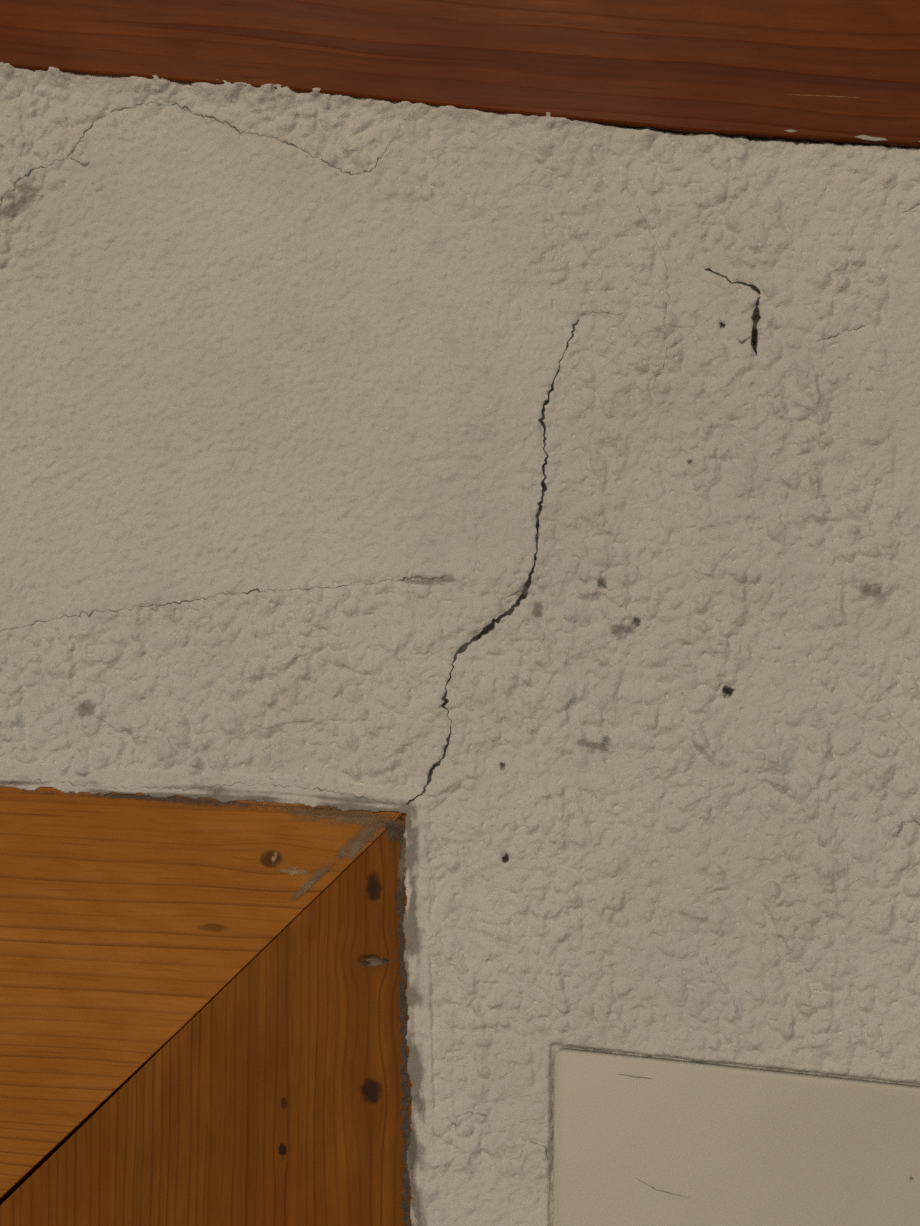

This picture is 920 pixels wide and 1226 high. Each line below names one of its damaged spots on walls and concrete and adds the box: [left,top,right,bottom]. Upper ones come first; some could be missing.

crack [705,268,760,355]
crack [406,314,583,805]